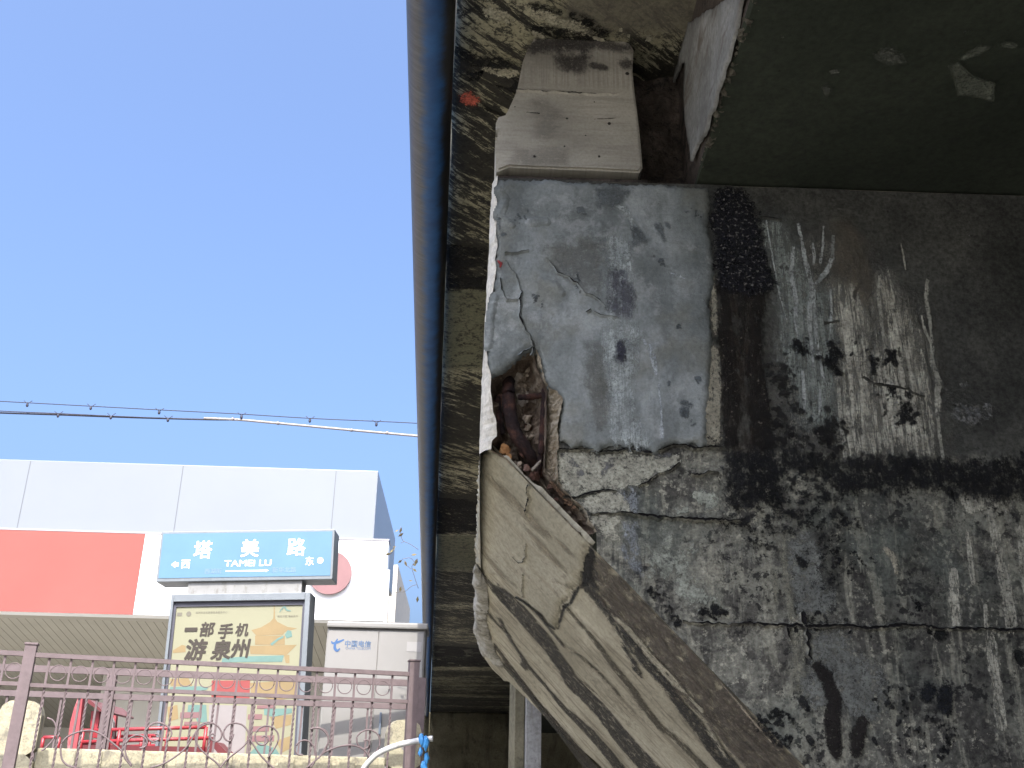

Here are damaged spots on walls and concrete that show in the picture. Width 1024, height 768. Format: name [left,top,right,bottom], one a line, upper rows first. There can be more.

flaking render [673,0,759,168]
crack [498,249,618,358]
crack [512,485,532,598]
flaking render [475,349,597,628]
crack [558,444,742,525]
water stain [675,187,1024,768]
crack [682,612,1024,660]